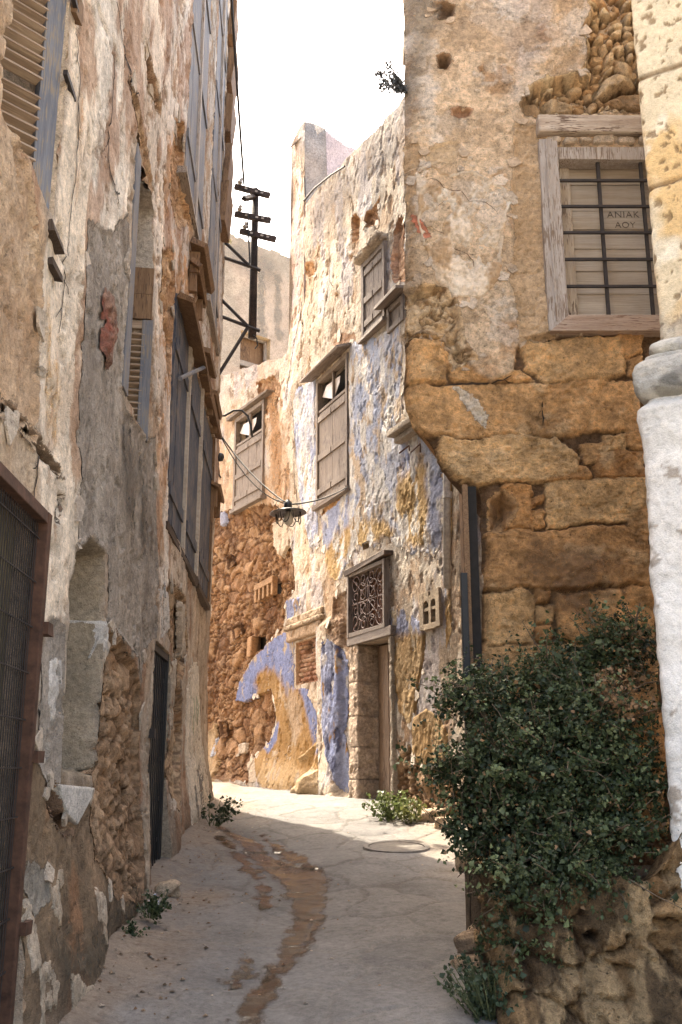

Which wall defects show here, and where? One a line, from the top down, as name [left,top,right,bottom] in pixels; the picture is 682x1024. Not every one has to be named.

spalling [0,0,48,493]
crack [56,39,81,331]
crack [428,178,497,267]
peeling [70,0,640,944]
water stain [214,826,333,1024]